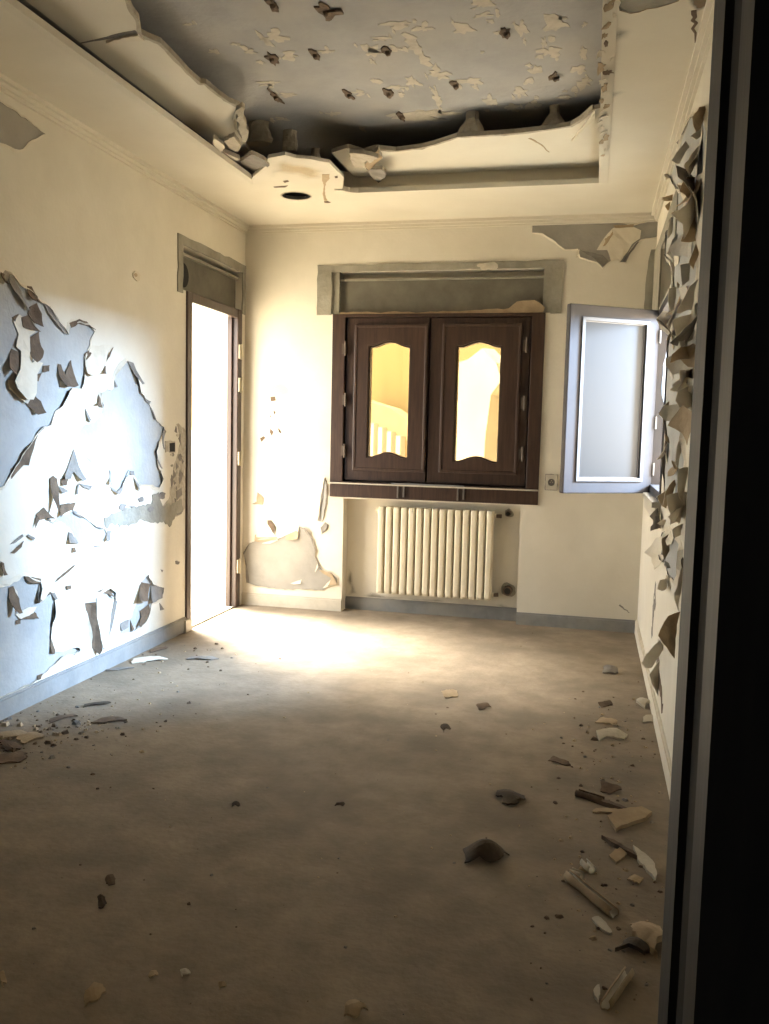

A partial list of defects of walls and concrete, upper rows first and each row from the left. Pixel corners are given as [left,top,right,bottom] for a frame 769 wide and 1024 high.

peeling [0,100,46,153]
peeling [0,270,186,698]
peeling [243,479,339,591]
peeling [531,104,708,696]